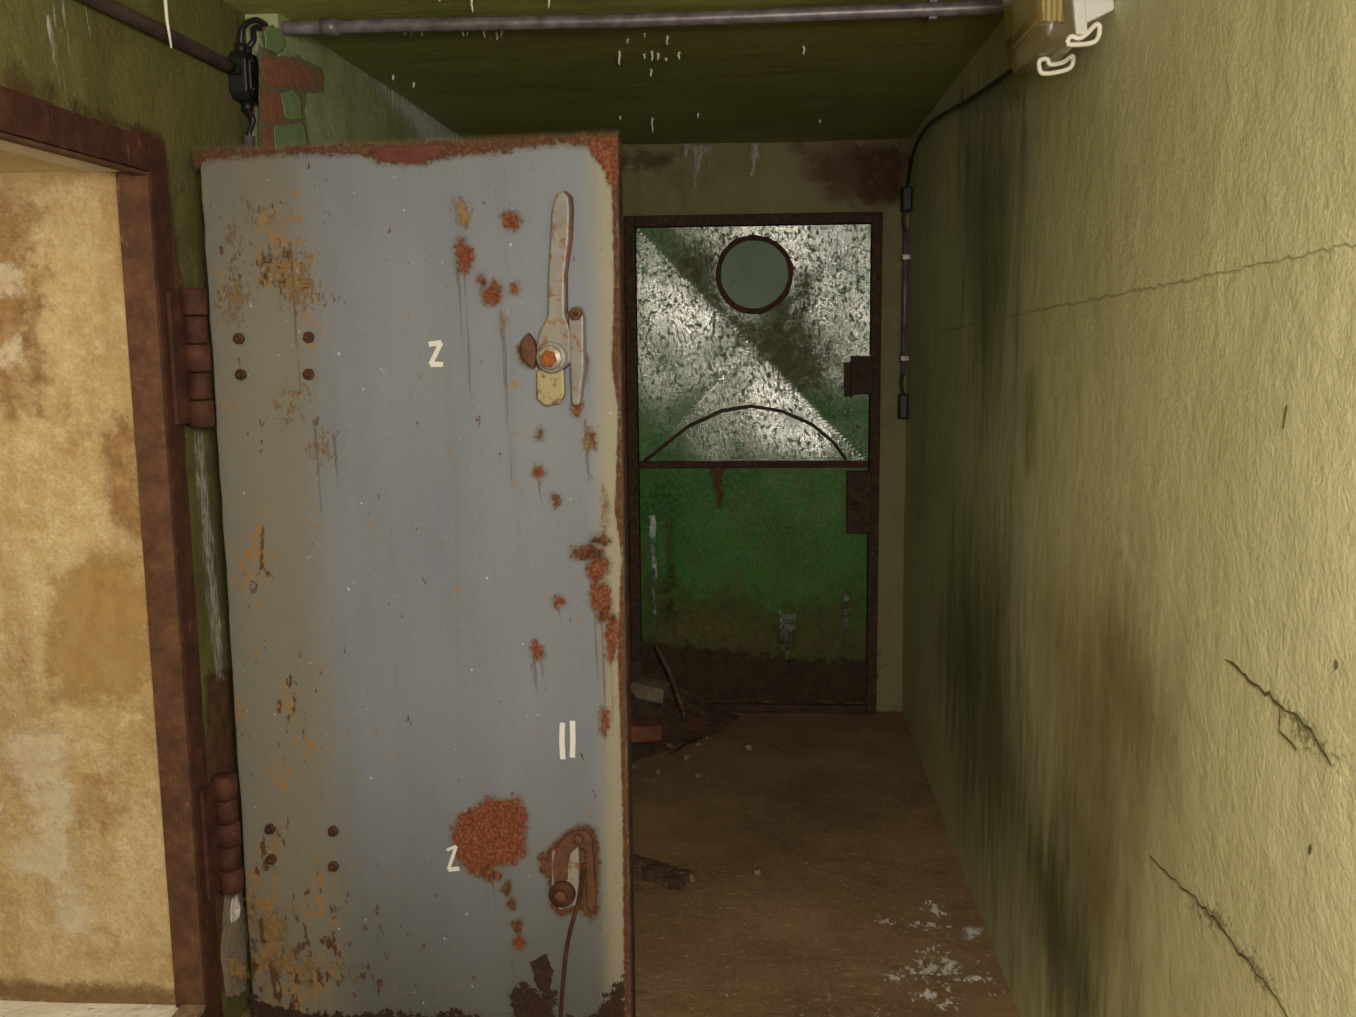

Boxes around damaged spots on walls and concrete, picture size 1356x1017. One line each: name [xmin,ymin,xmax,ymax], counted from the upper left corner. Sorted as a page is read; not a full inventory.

spalling [253,25,324,151]
corrosion [193,132,631,1017]
crack [1225,659,1353,771]
crack [1149,855,1288,1017]